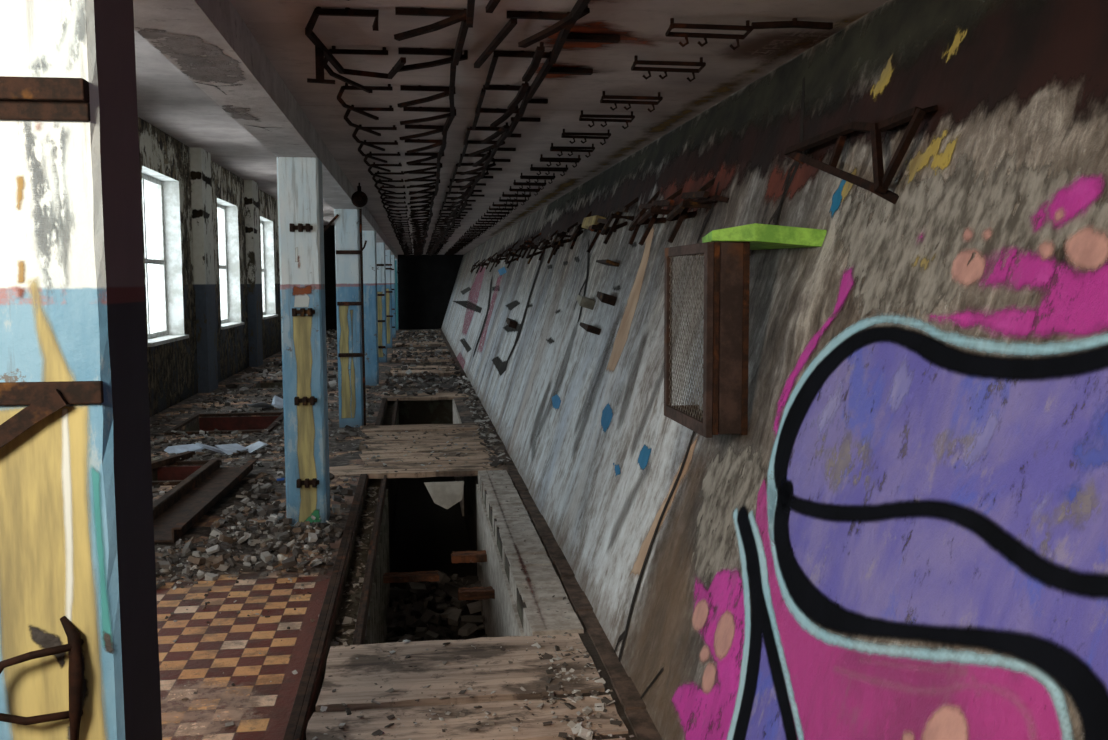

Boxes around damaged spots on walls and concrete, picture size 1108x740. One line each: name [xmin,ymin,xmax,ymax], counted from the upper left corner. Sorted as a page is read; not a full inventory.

peeling [23,121,70,289]
peeling [63,2,86,54]
peeling [139,117,196,358]
peeling [137,27,246,85]
peeling [222,105,258,121]
corrosion [497,0,1108,256]